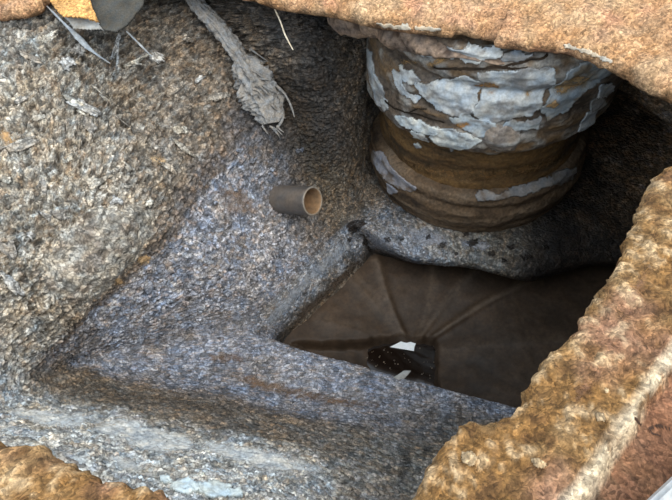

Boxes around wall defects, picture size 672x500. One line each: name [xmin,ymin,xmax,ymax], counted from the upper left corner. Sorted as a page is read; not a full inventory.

peeling [376,22,441,32]
peeling [366,48,389,112]
peeling [391,41,615,152]
peeling [371,150,417,195]
peeling [475,167,577,202]